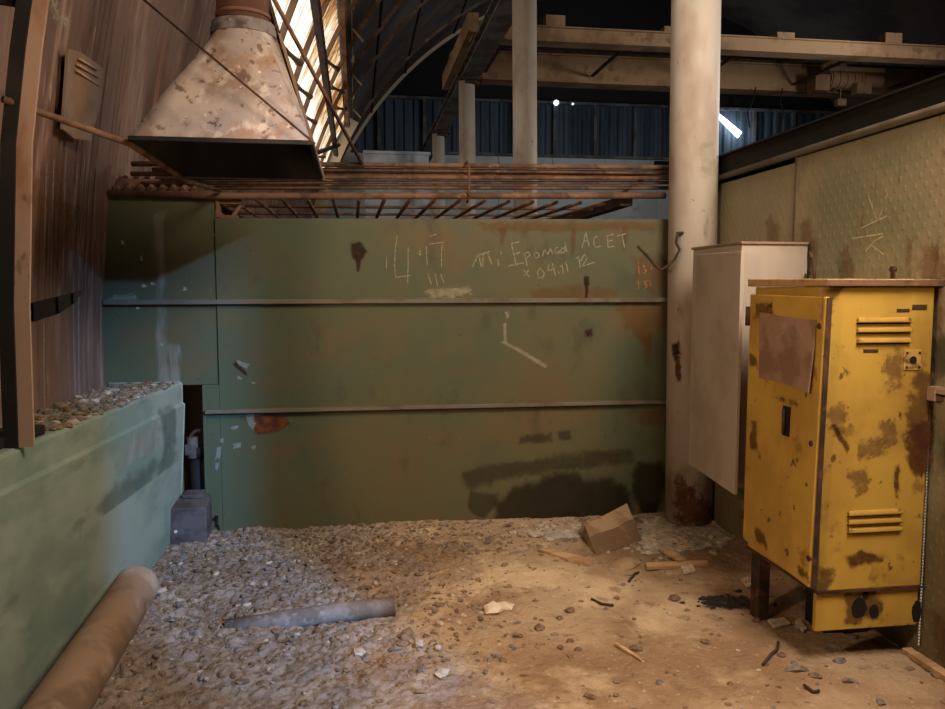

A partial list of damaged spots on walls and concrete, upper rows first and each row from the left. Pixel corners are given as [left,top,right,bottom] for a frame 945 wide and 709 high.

rust [351,242,367,272]
peeling [251,414,290,434]
water stain [498,462,665,541]
rust [673,478,713,527]